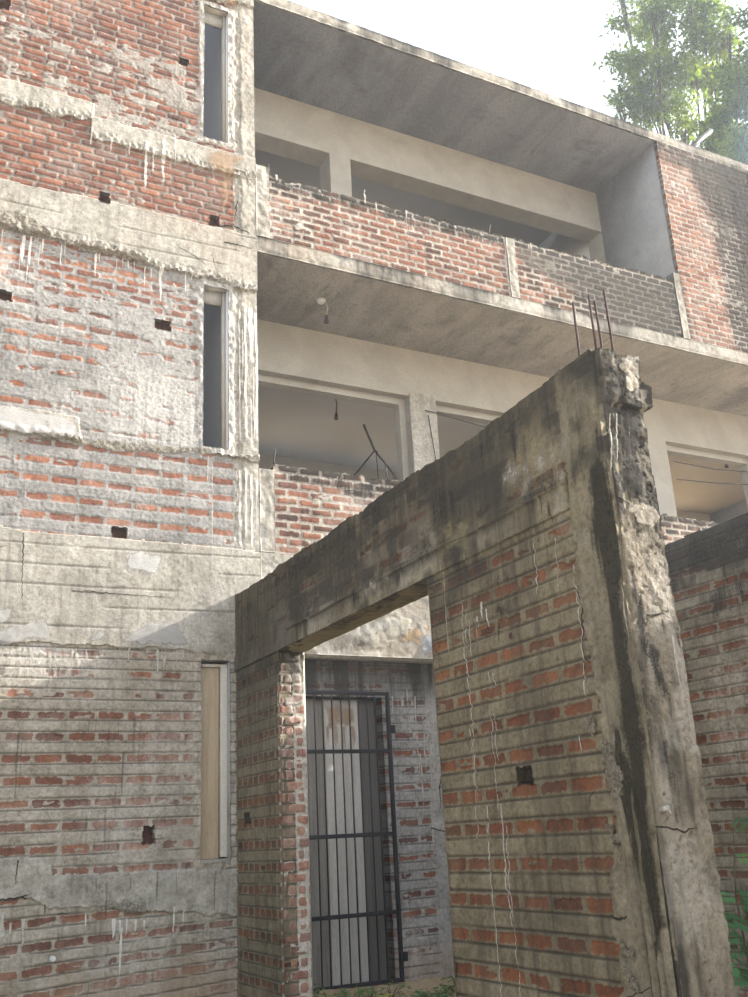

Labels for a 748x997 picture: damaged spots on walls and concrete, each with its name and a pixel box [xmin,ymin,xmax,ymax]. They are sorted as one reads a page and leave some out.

efflorescence [144,139,177,189]
efflorescence [18,234,44,280]
efflorescence [116,258,164,301]
spalling [619,358,639,391]
water stain [595,413,630,483]
spalling [629,503,660,529]
crack [0,533,24,600]
water stain [573,565,586,696]
water stain [461,602,521,997]
crack [656,825,697,833]
crack [0,860,67,915]